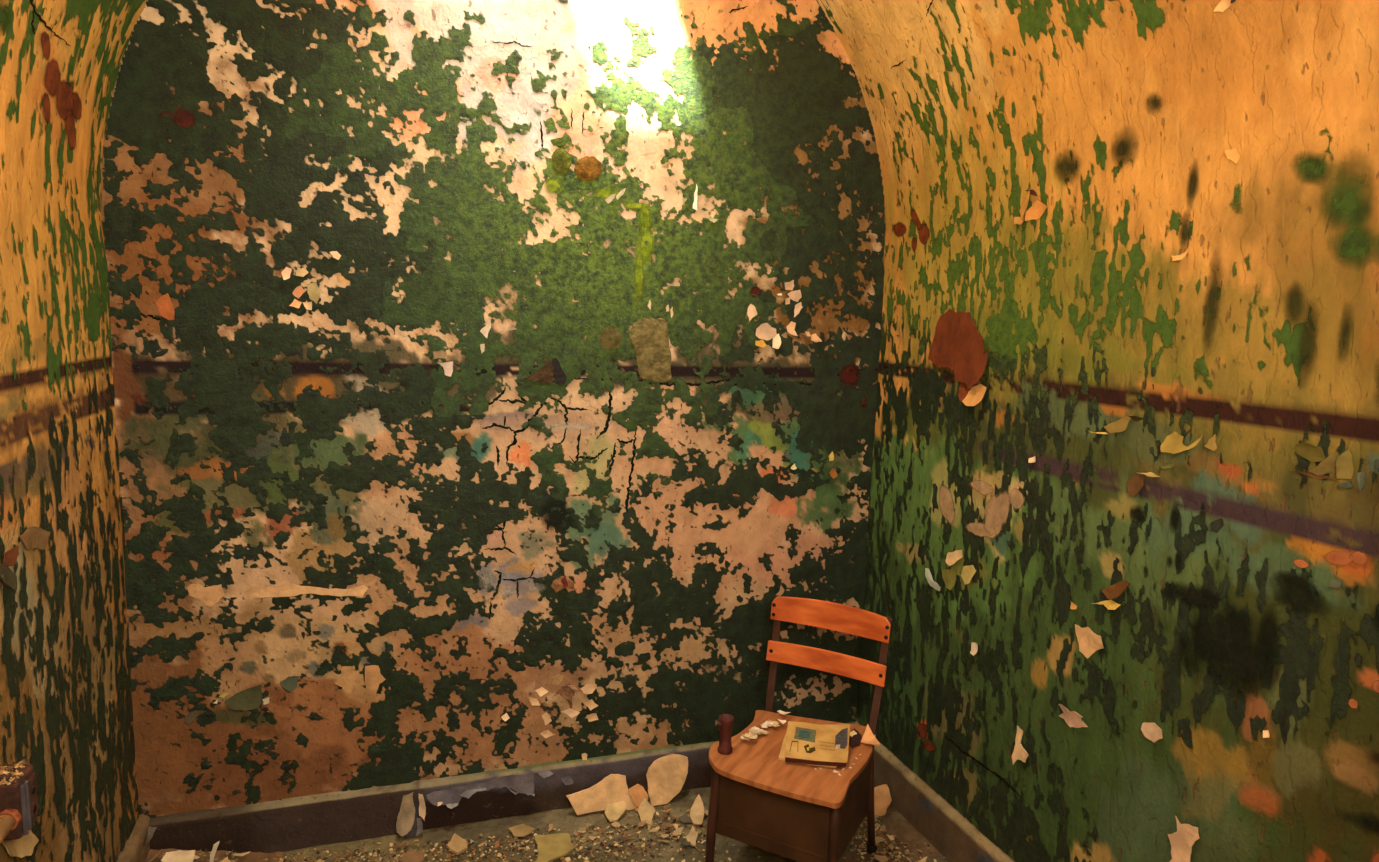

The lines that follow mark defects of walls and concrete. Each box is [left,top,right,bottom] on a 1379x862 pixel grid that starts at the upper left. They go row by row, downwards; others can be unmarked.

crack [492,40,532,76]
crack [540,108,585,150]
peeling [281,267,321,310]
peeling [747,280,822,349]
crack [482,378,812,513]
peeling [246,584,368,599]
crack [484,521,539,620]
peeling [925,550,976,591]
peeling [1070,581,1131,658]
peeling [1012,726,1029,765]
peeling [396,769,574,839]
peeling [1168,816,1200,862]